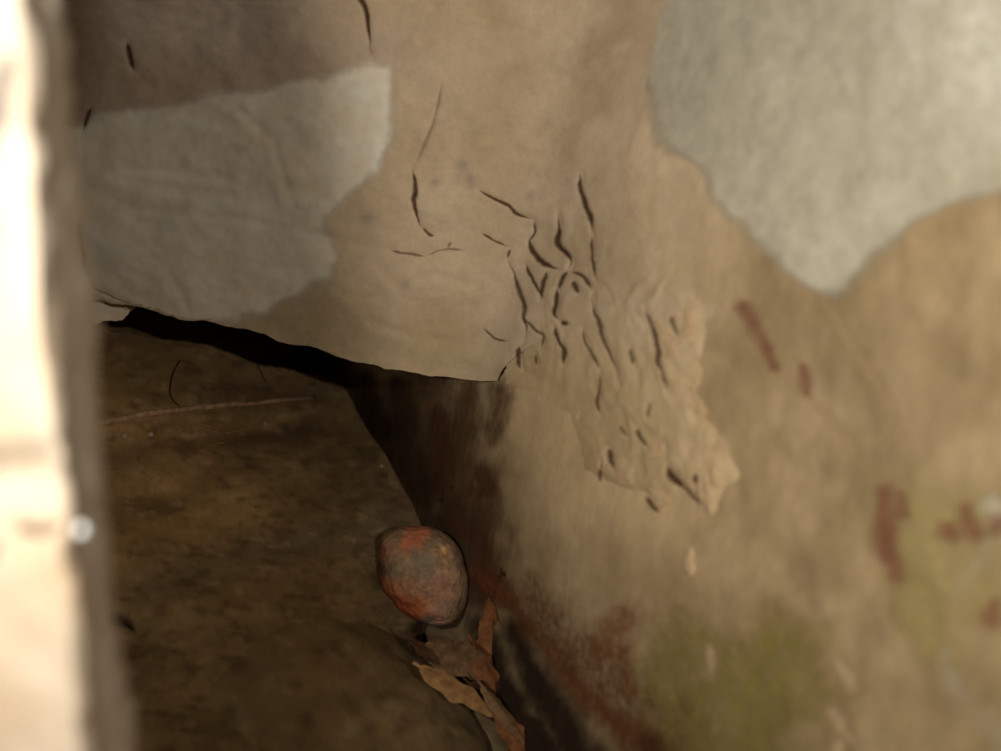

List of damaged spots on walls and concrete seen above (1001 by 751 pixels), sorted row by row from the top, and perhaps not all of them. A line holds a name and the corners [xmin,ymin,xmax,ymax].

crack [359,0,371,41]
spalling [71,62,393,323]
crack [412,174,432,236]
crack [481,177,677,412]
spalling [647,0,1001,296]
crack [599,428,646,480]